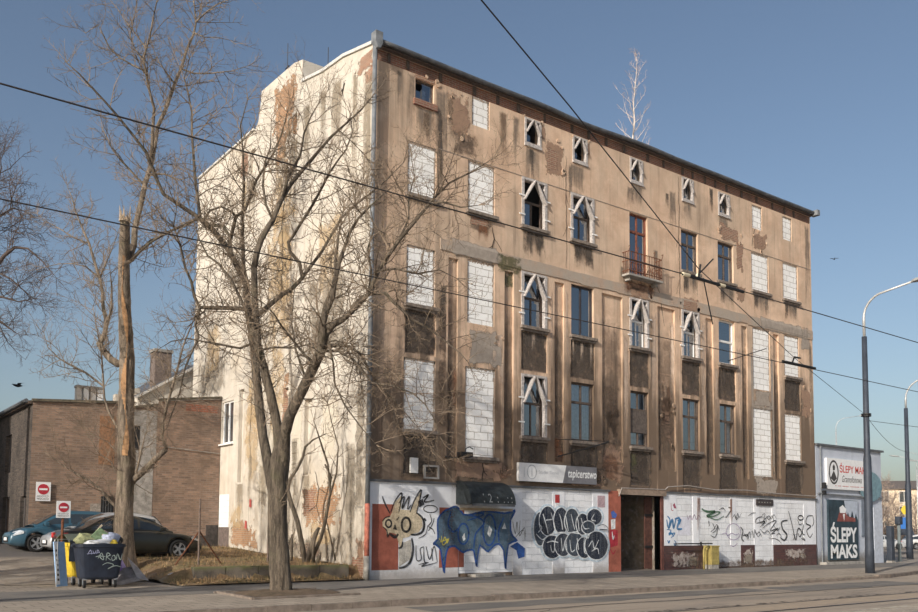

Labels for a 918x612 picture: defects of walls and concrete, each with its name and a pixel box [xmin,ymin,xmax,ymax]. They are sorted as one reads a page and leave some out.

spalling [272,74,300,165]
peeling [448,93,475,154]
peeling [540,121,566,178]
damp [527,233,544,251]
damp [575,245,592,262]
peeling [718,222,768,273]
damp [624,317,656,410]
spalling [301,480,341,529]